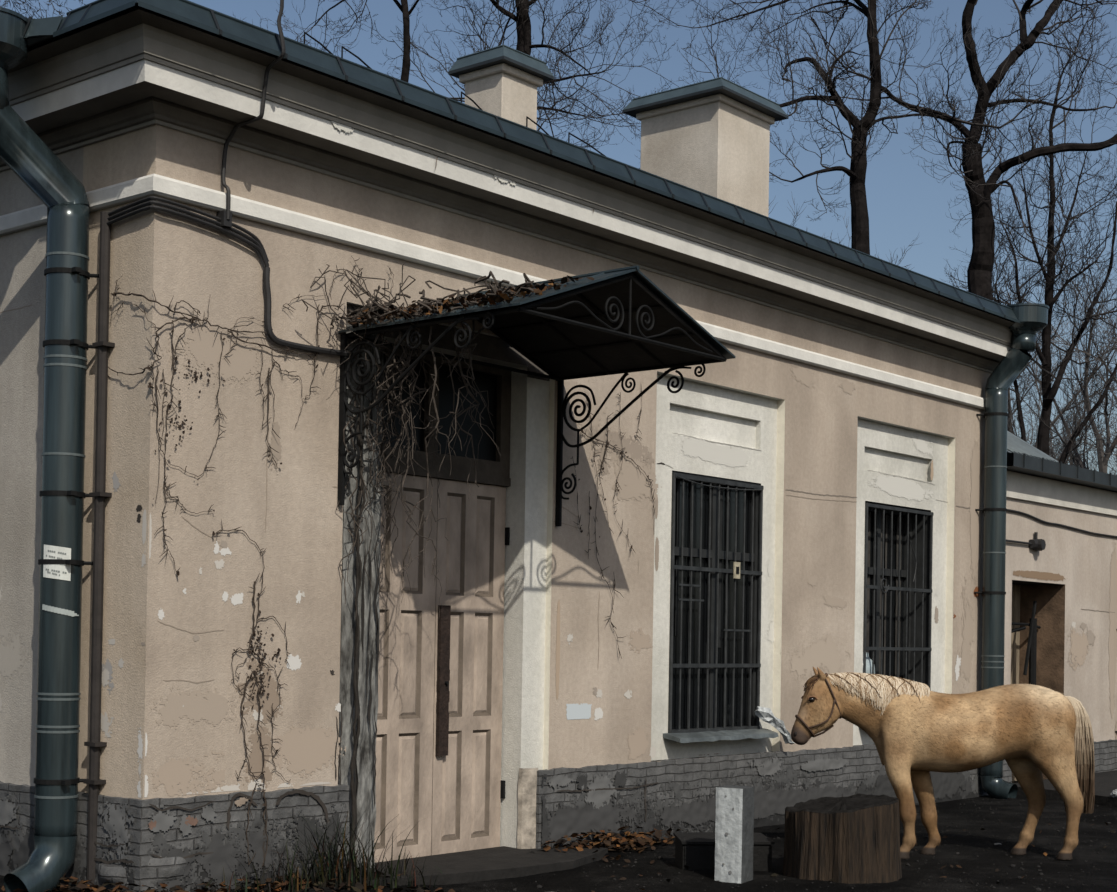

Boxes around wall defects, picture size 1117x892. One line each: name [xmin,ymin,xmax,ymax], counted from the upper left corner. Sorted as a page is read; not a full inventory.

spalling [214,541,232,569]
spalling [222,591,243,606]
spalling [287,654,302,670]
peeling [744,756,784,781]
peeling [548,772,618,809]
peeling [0,796,18,826]
peeling [98,775,332,860]